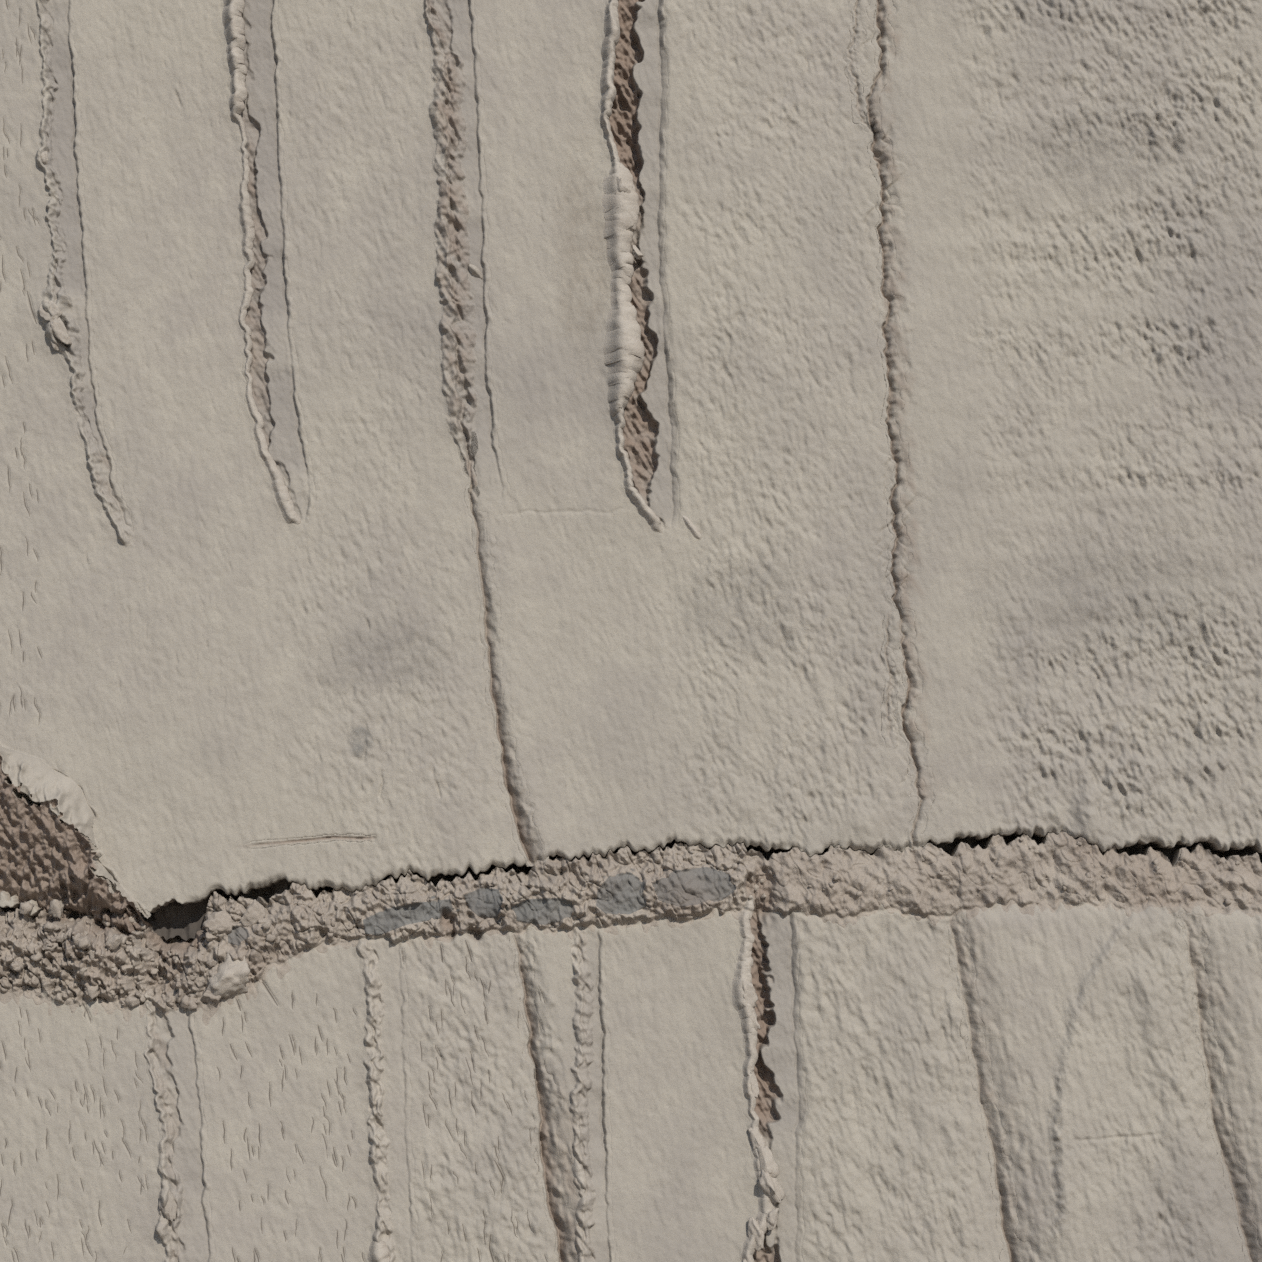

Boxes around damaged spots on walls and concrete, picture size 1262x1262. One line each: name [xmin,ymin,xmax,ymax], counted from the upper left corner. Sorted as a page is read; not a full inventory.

crack [0,422,42,723]
crack [0,0,137,548]
crack [142,0,870,941]
crack [844,0,1042,855]
crack [5,905,79,919]
spalling [0,746,152,941]
crack [1116,842,1262,864]
crack [0,921,616,1262]